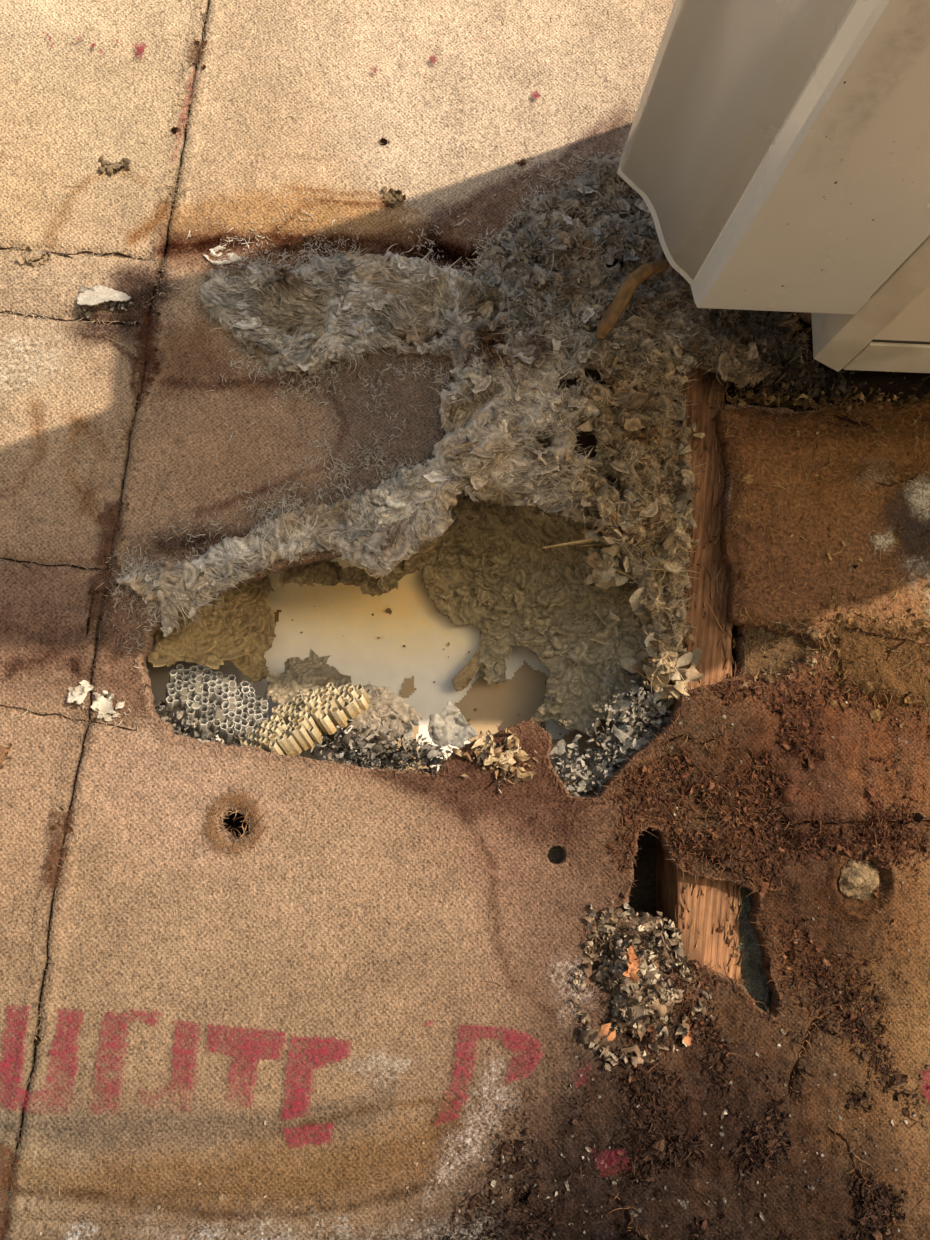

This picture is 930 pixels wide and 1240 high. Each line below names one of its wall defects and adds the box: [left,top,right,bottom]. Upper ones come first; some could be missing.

peeling [382,186,406,207]
leakage [871,474,930,578]
peeling [400,676,416,697]
peeling [391,725,438,773]
peeling [452,660,621,794]
leakage [598,655,930,1155]
leakage [370,961,825,1240]
leakage [824,1171,908,1240]